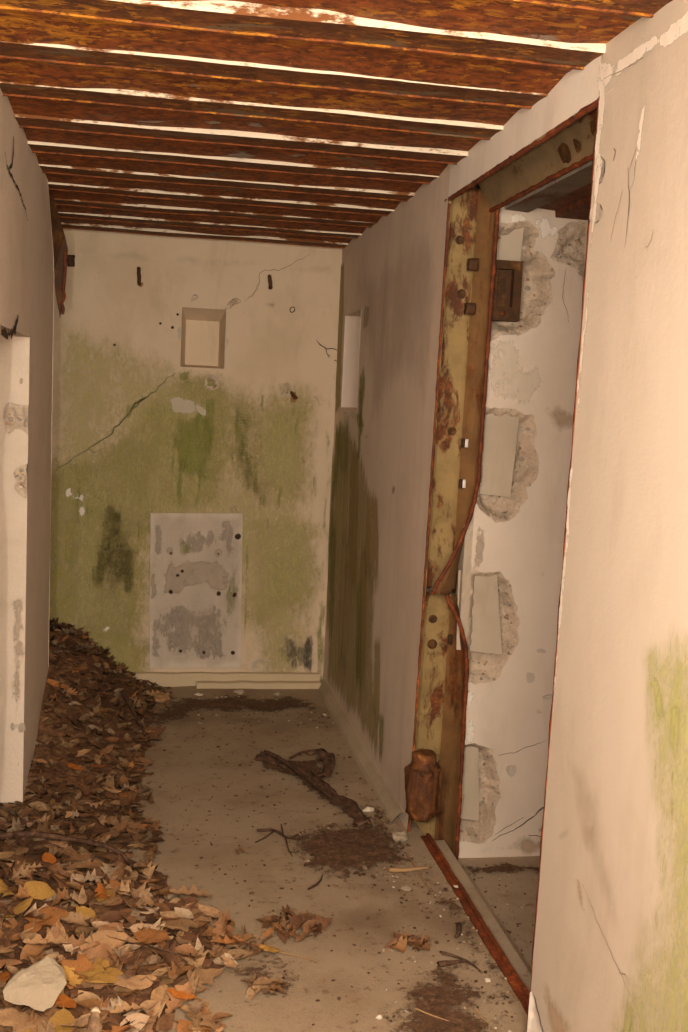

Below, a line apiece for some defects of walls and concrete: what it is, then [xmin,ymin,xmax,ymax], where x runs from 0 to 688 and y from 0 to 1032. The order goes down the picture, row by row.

crack [5,136,28,220]
crack [610,147,653,248]
spalling [476,11,688,523]
crack [59,373,175,468]
peeling [151,531,228,598]
water stain [327,389,383,757]
peeling [160,606,226,657]
spalling [456,569,520,844]
crack [492,807,544,841]